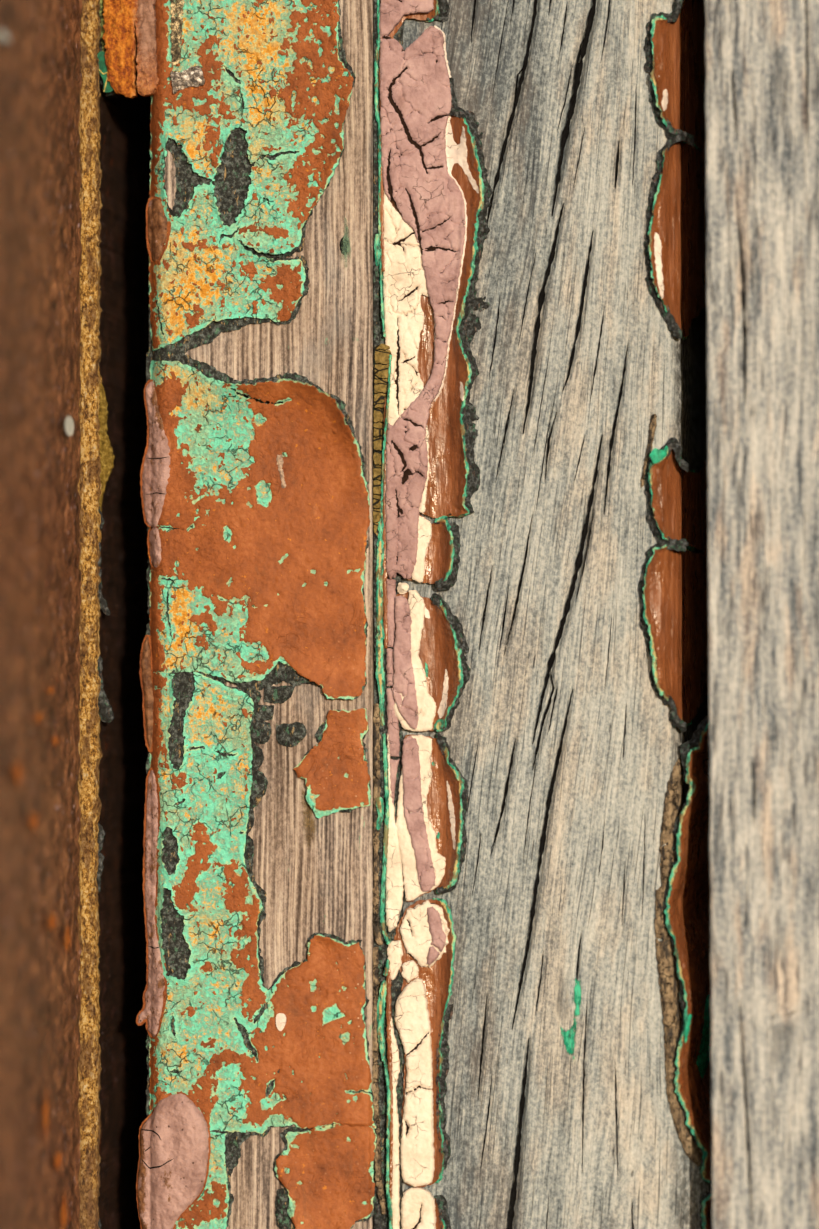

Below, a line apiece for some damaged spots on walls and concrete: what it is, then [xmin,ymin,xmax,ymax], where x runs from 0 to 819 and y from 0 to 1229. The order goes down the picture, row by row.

crack [615,83,637,188]
peeling [650,446,668,464]
peeling [146,0,392,1229]
crack [467,0,629,1229]
crack [599,820,645,918]
peeling [685,995,711,1079]